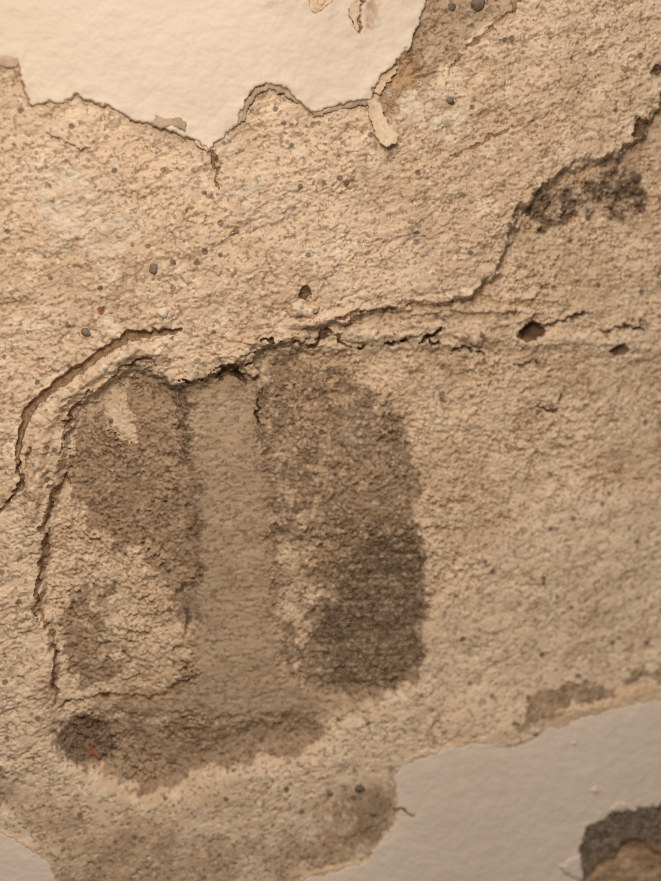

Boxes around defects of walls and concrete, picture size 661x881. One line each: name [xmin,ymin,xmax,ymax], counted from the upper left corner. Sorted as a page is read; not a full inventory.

peeling [367,66,416,147]
flaking render [286,301,319,319]
flaking render [341,324,381,343]
crack [259,303,485,360]
flaking render [453,326,502,347]
crack [513,359,547,368]
crack [542,310,647,333]
crack [178,363,275,425]
crack [532,393,563,413]
water stain [51,348,429,797]
flaking render [265,478,343,684]
flaking render [559,802,661,881]